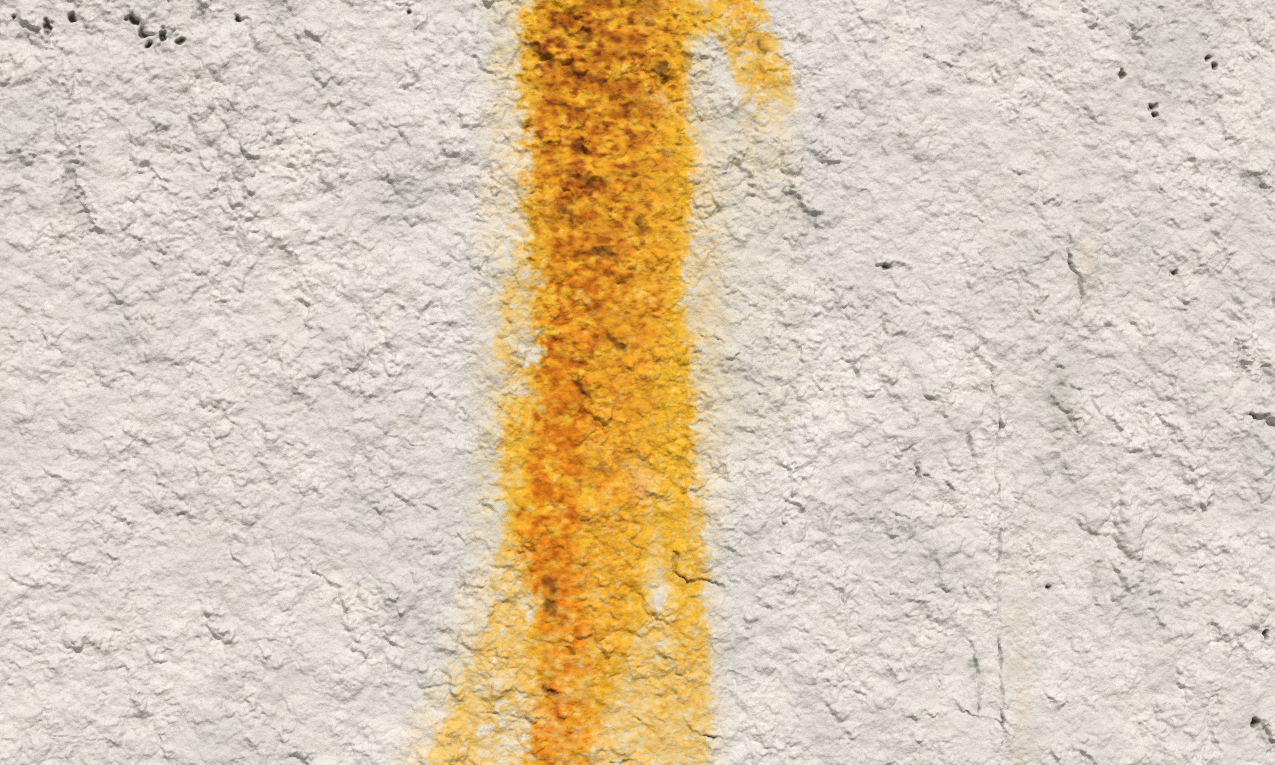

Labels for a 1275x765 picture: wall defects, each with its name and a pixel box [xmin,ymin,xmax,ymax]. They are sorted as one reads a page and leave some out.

rust [388,0,810,765]
crack [908,369,1006,746]